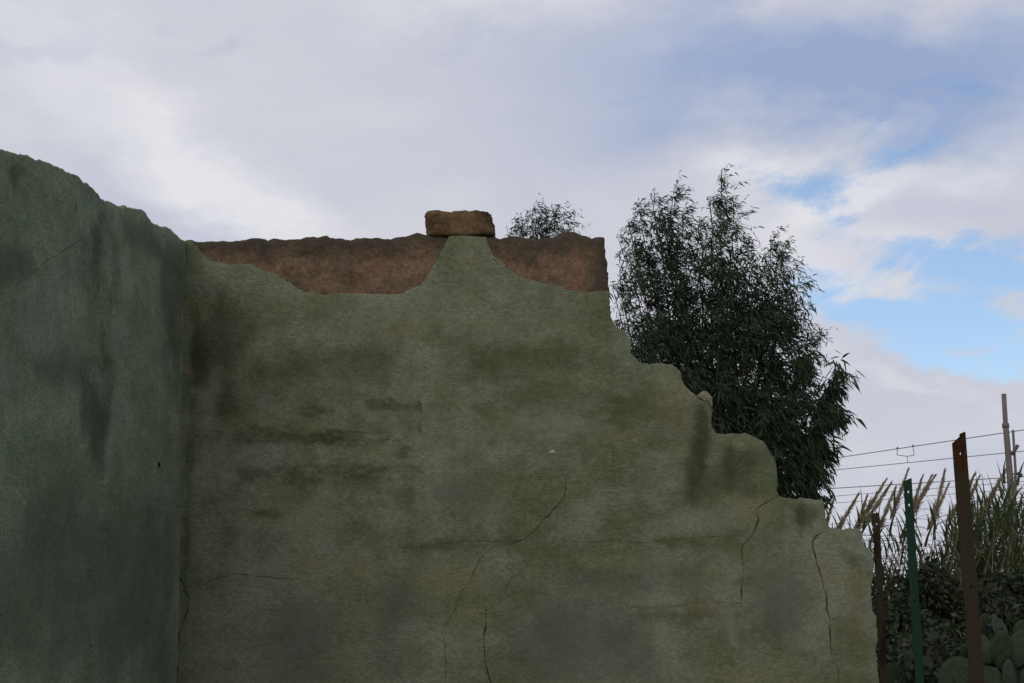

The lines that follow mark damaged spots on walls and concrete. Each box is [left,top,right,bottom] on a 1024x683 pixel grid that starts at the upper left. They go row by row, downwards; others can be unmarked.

spalling [194,233,449,295]
spalling [486,231,610,297]
crack [443,478,566,683]
crack [741,499,772,603]
crack [812,530,832,651]